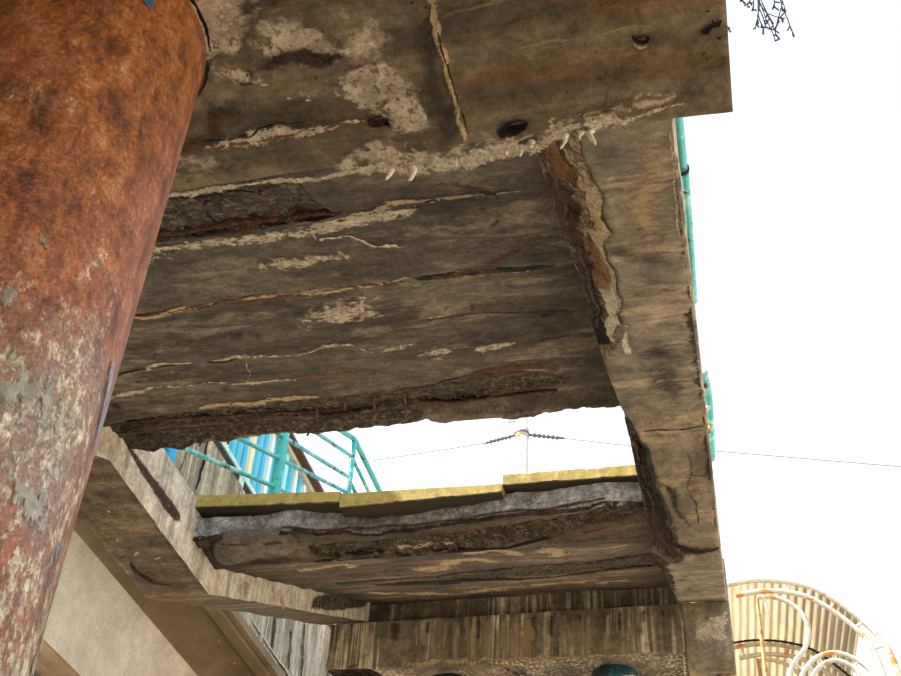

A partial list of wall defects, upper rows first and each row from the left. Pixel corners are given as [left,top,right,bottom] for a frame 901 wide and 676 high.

damp [188,0,379,63]
crack [421,0,469,141]
spalling [156,178,346,242]
spalling [491,121,623,355]
spalling [90,360,569,522]
crack [642,424,705,432]
spalling [193,534,223,542]
spalling [279,417,683,611]
crack [687,453,710,523]